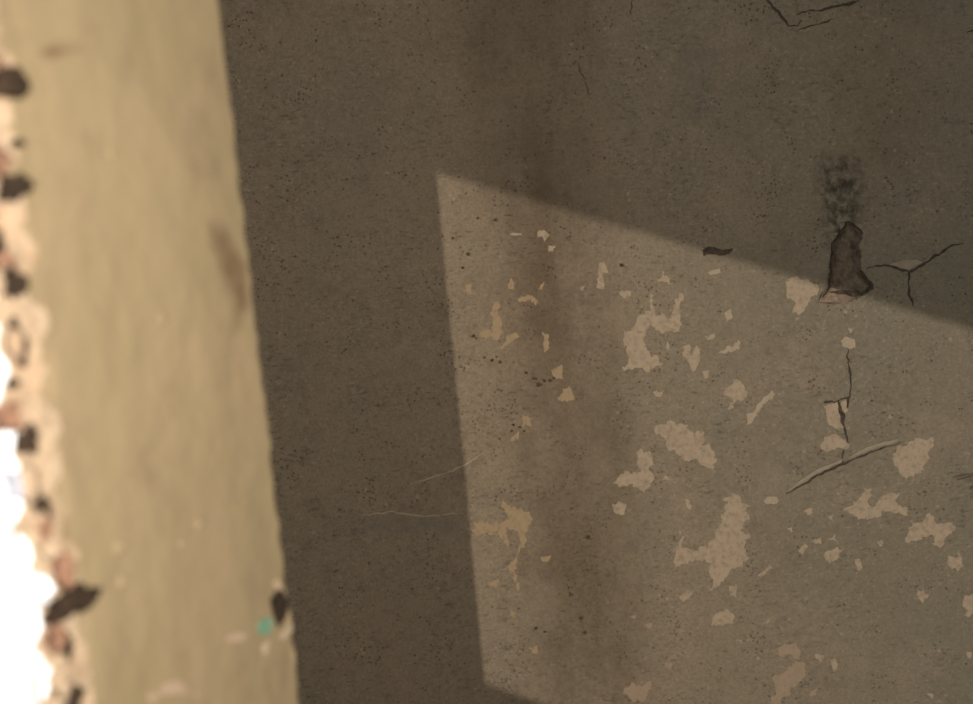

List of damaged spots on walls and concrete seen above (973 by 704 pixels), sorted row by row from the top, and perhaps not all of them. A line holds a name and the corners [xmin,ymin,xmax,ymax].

crack [766,0,859,30]
spalling [0,56,30,99]
spalling [0,137,34,203]
spalling [0,228,29,301]
spalling [786,221,874,315]
crack [866,243,964,306]
peeling [622,293,684,373]
peeling [654,418,718,469]
crack [786,348,900,494]
spalling [0,401,103,704]
peeling [672,493,751,597]
peeling [843,488,964,571]